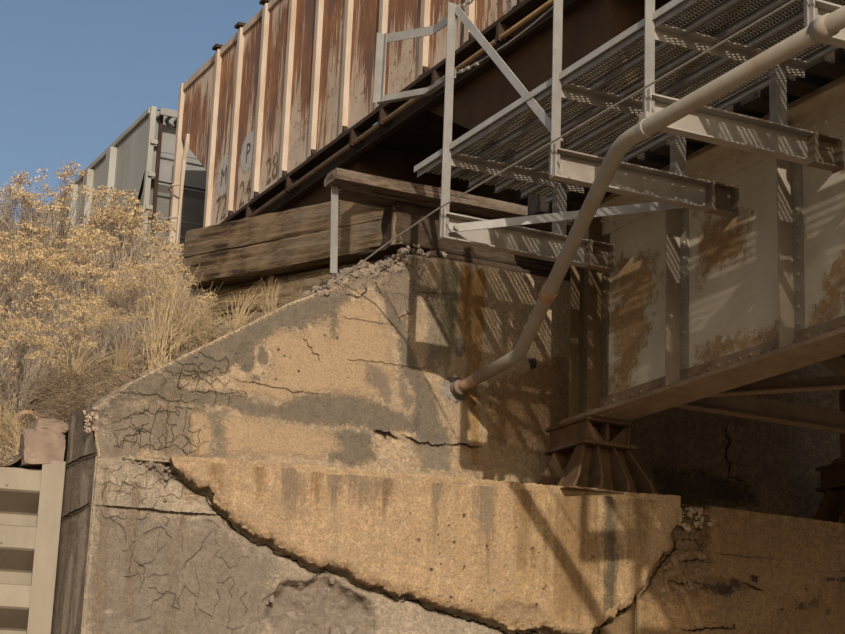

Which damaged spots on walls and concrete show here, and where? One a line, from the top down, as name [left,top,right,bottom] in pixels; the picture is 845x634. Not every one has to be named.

rust [696,208,754,280]
rust [461,267,485,378]
rust [608,251,663,393]
rust [809,252,845,325]
damp [375,287,465,470]
crack [61,351,370,629]
damp [328,429,391,505]
crack [373,430,483,448]
peeling [658,505,715,577]
crack [664,552,773,587]
crack [682,624,736,632]